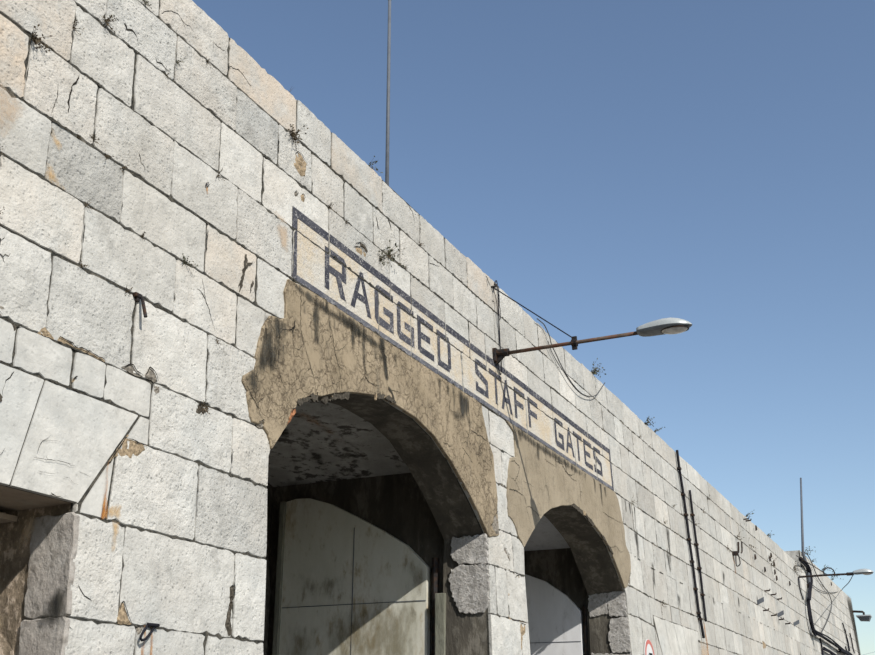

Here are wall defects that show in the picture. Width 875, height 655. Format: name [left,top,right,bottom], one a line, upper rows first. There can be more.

crack [52,77,79,113]
crack [239,254,254,292]
crack [246,288,398,417]
damp [299,288,396,379]
spalling [281,391,350,437]
spalling [109,435,147,462]
rust [102,489,119,534]